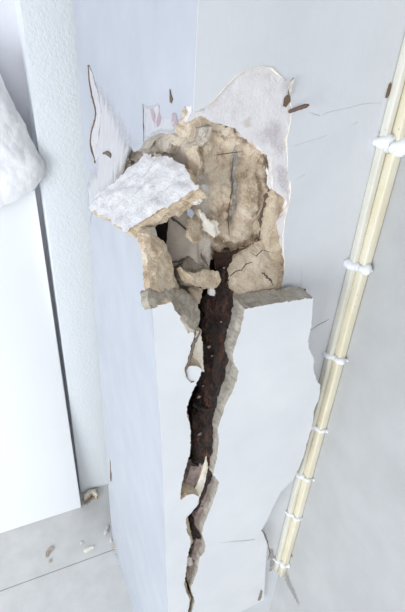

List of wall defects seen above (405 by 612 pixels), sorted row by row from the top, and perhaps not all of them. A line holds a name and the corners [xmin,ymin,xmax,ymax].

spalling [87,65,294,296]
crack [183,287,213,601]
crack [200,250,216,271]
rust [188,246,247,545]